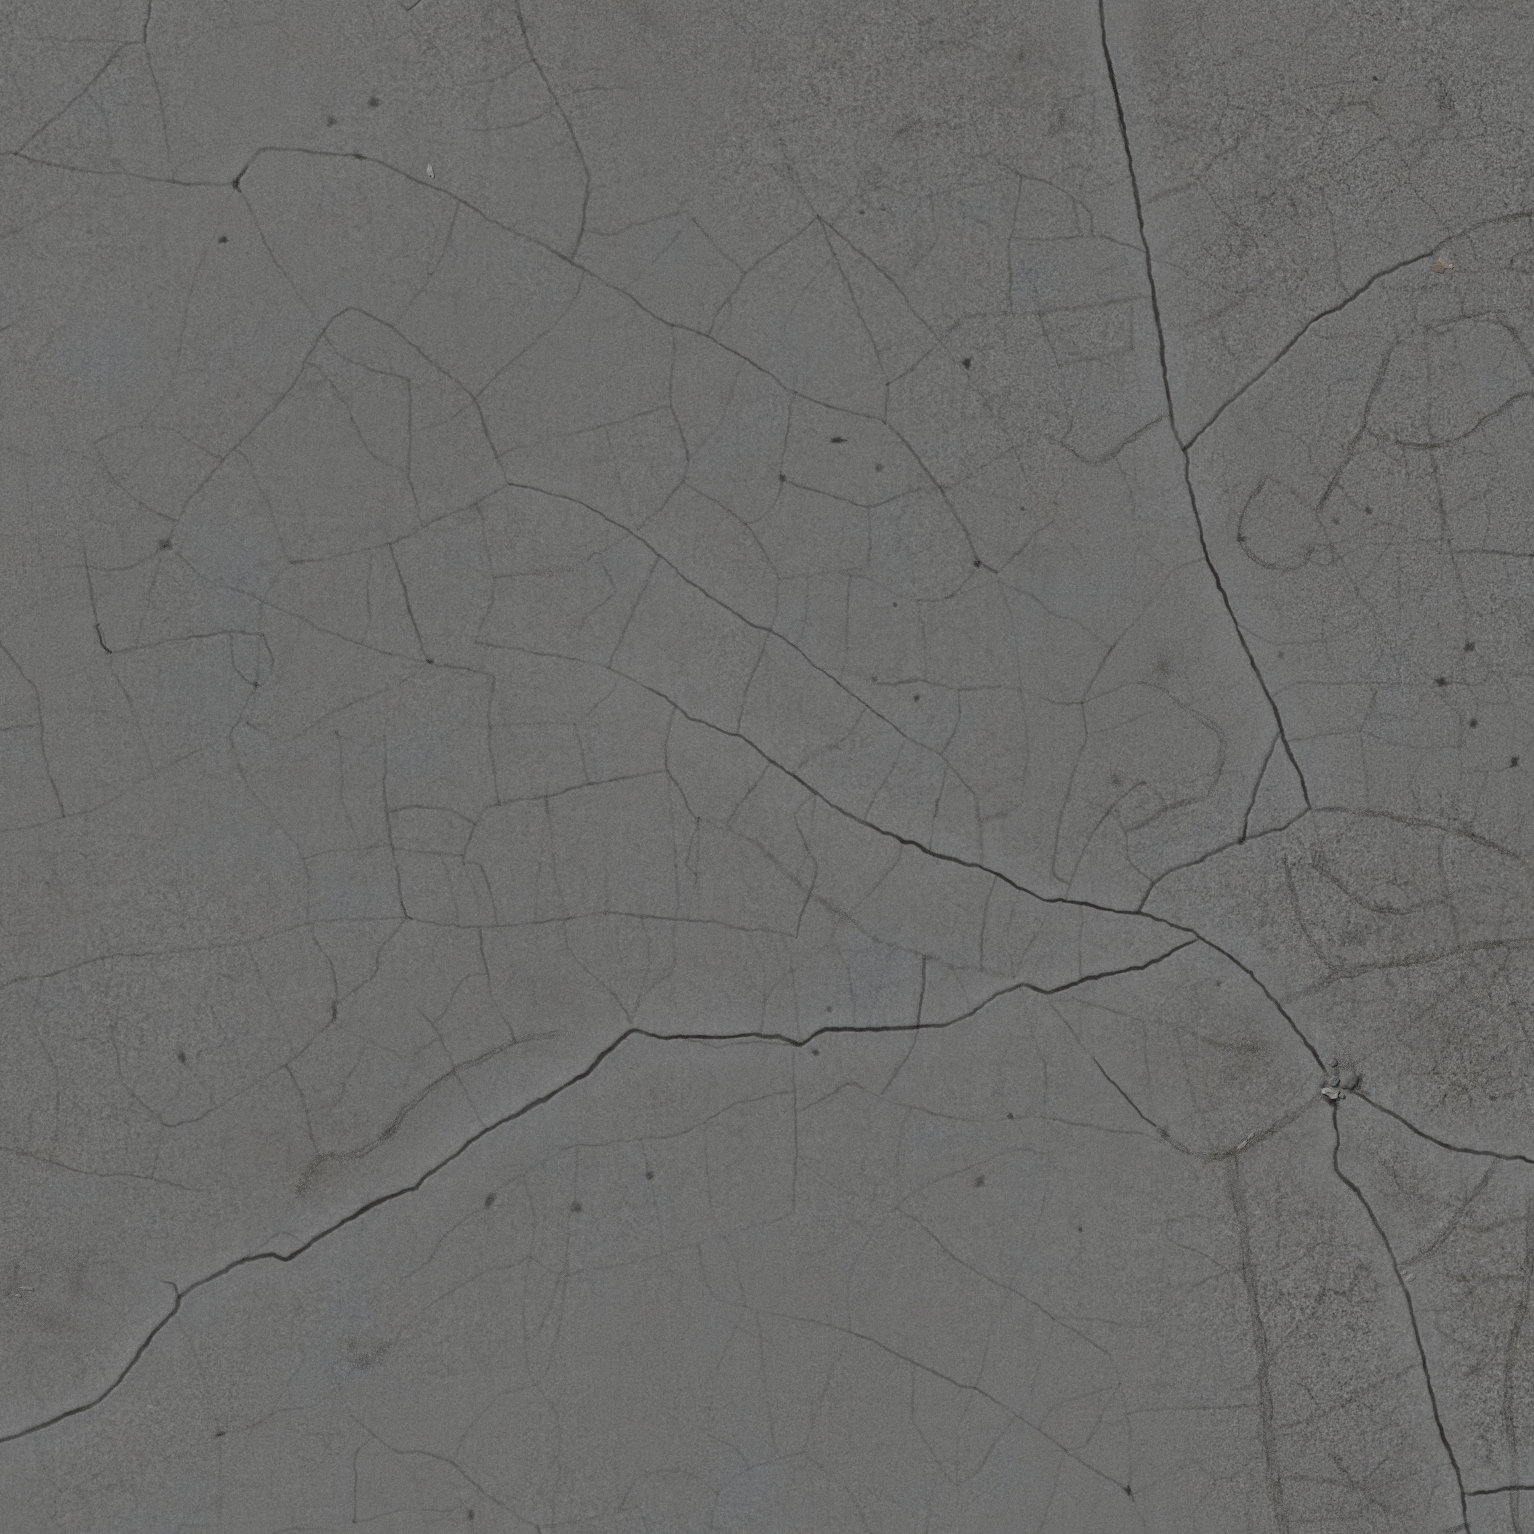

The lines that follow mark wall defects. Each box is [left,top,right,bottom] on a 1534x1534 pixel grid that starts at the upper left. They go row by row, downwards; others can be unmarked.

crack [1277,253,1432,359]
crack [1099,0,1308,840]
crack [869,824,1325,1070]
crack [240,1008,977,1263]
crack [1333,1093,1388,1245]
crack [1402,1120,1534,1163]
crack [48,1314,173,1425]
crack [1406,1293,1534,1515]